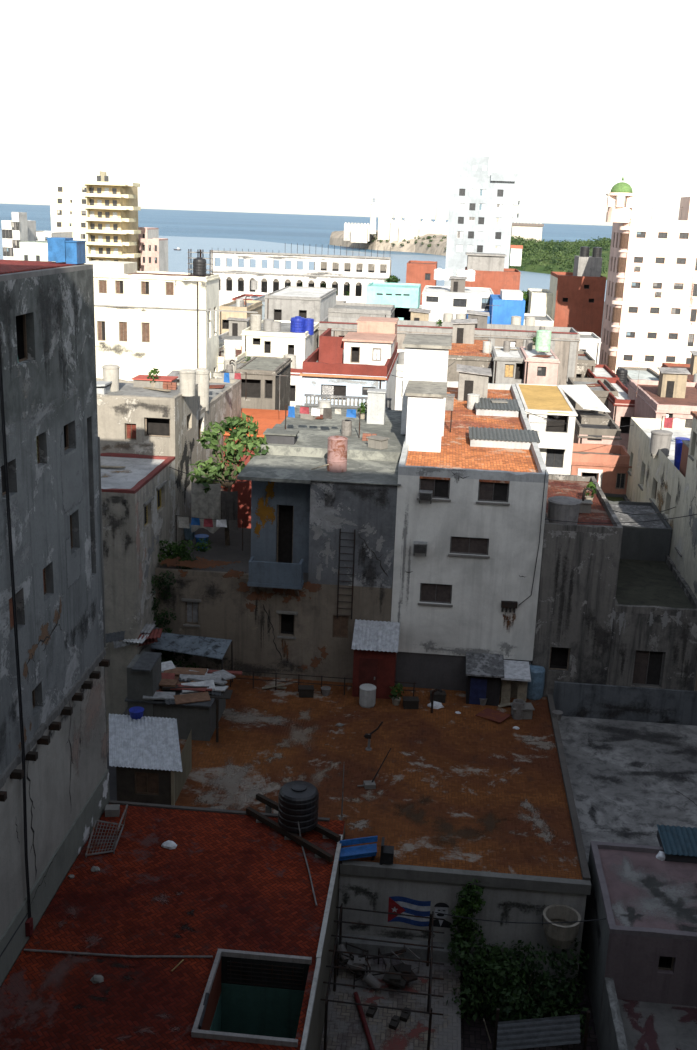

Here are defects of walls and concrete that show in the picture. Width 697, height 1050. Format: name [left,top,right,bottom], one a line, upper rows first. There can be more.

water stain [40,287,80,411]
peeling [254,481,275,538]
spalling [158,515,386,612]